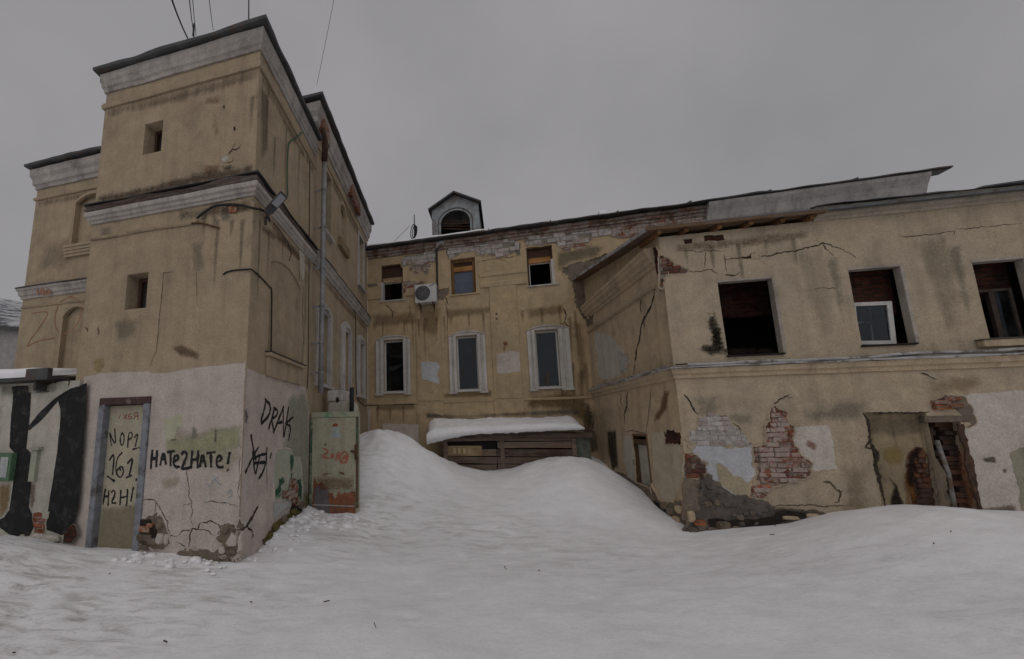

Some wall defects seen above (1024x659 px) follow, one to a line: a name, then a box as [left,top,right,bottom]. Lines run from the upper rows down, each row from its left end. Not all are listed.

flaking render [684,235,724,244]
crack [684,242,856,276]
crack [903,223,1018,237]
peeling [400,214,706,382]
crack [620,289,655,434]
damp [703,317,773,354]
spalling [931,394,978,429]
crack [143,438,259,547]
flaking render [663,404,814,531]
crack [774,481,852,508]
crack [863,411,929,506]
spalling [136,510,246,563]